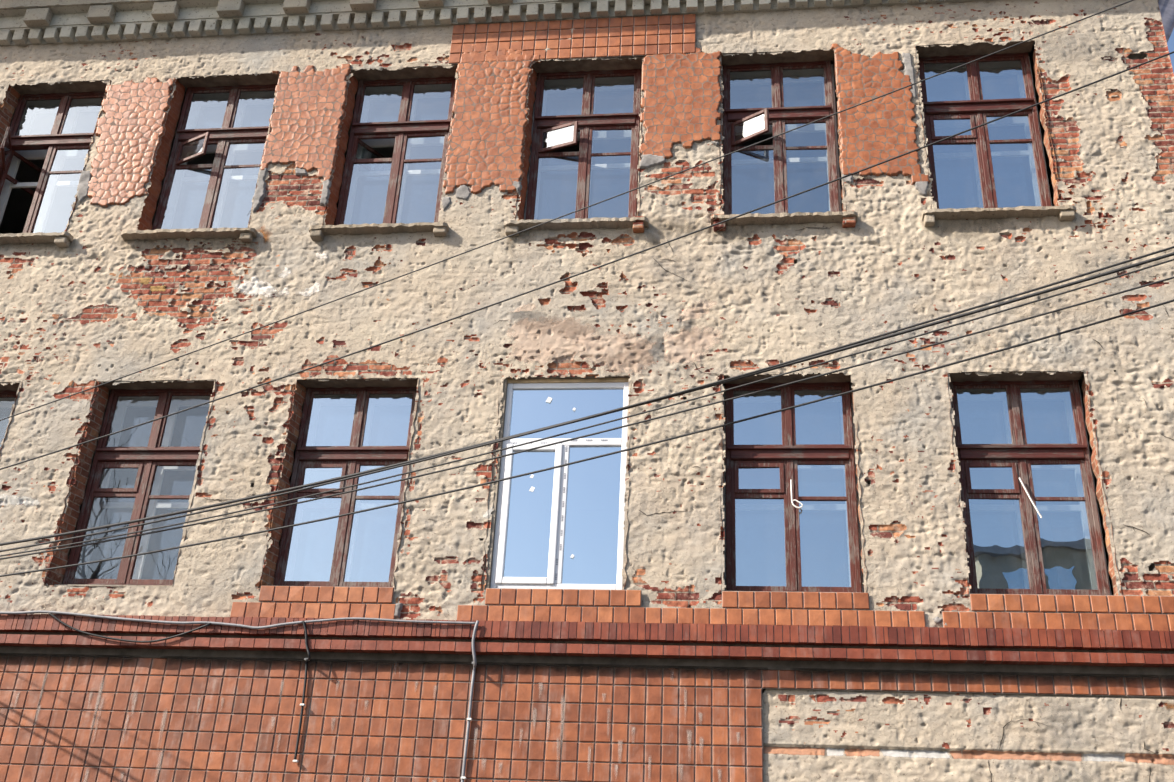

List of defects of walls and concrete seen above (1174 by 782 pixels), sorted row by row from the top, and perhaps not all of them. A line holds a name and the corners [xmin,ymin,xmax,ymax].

spalling [79,41,157,81]
spalling [837,1,1174,321]
spalling [871,315,978,382]
spalling [0,160,841,608]
spalling [1152,378,1174,389]
spalling [1119,558,1174,596]
spalling [395,592,443,619]